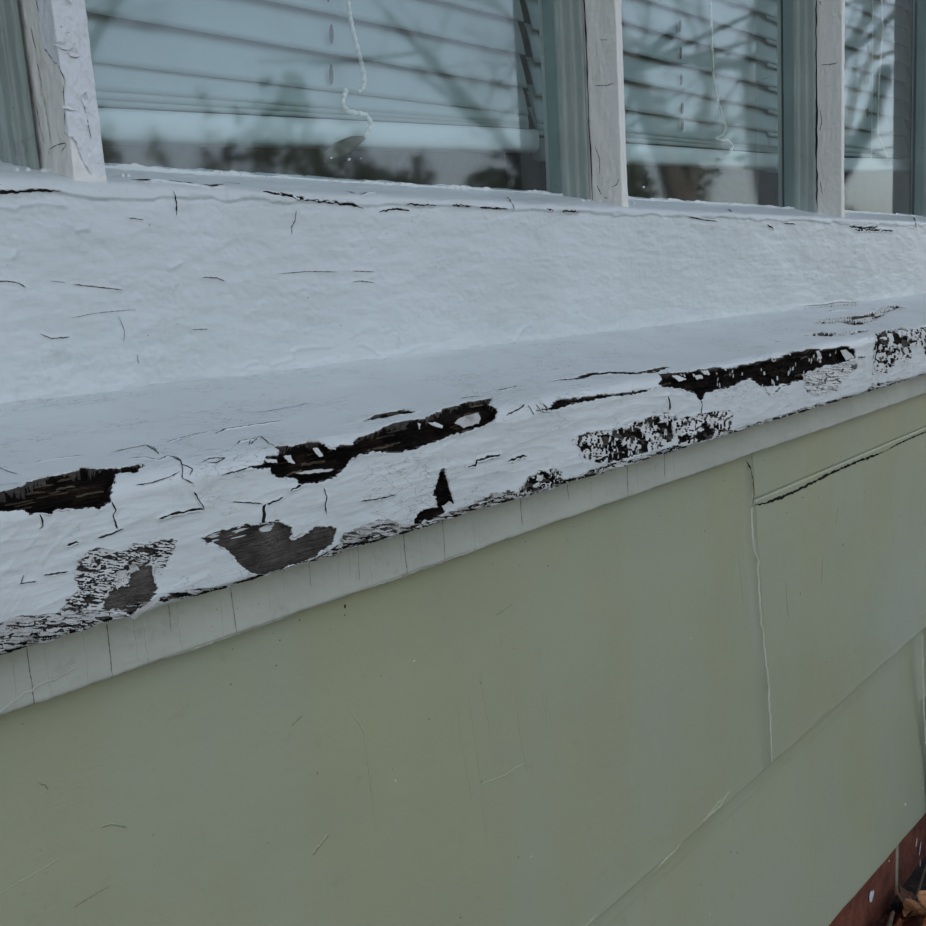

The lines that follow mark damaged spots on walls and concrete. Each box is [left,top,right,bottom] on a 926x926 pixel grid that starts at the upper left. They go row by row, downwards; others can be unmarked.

peeling [37,0,106,178]
crack [41,281,136,339]
crack [500,386,551,415]
crack [67,501,123,548]
crack [112,402,309,524]
crack [360,494,397,503]
peeling [0,301,926,655]
crack [468,454,527,470]
crack [745,431,926,507]
crack [20,571,68,584]